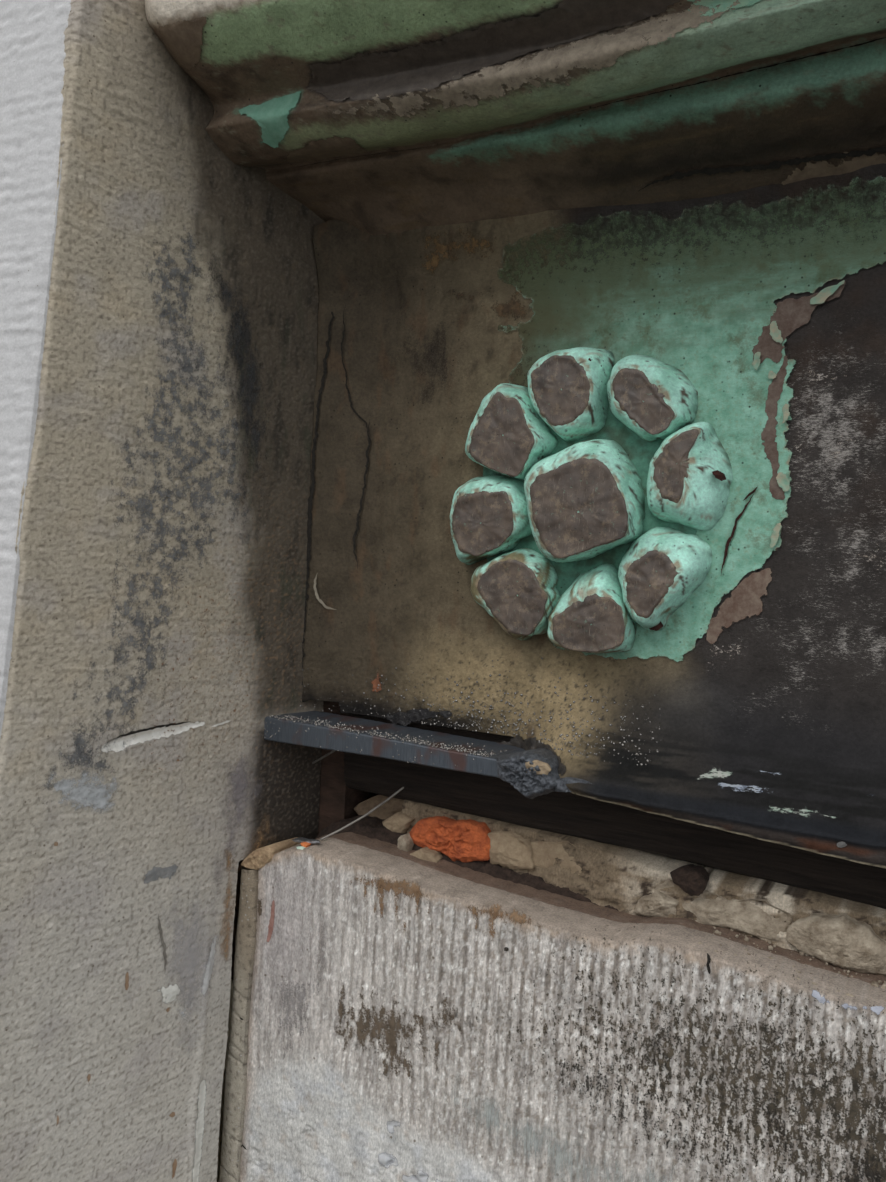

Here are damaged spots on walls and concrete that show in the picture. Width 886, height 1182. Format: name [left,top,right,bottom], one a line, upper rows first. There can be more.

peeling [239,91,301,148]
peeling [752,280,846,500]
crack [300,305,371,702]
peeling [770,523,782,548]
damp [278,983,319,1057]
damp [335,928,886,1182]